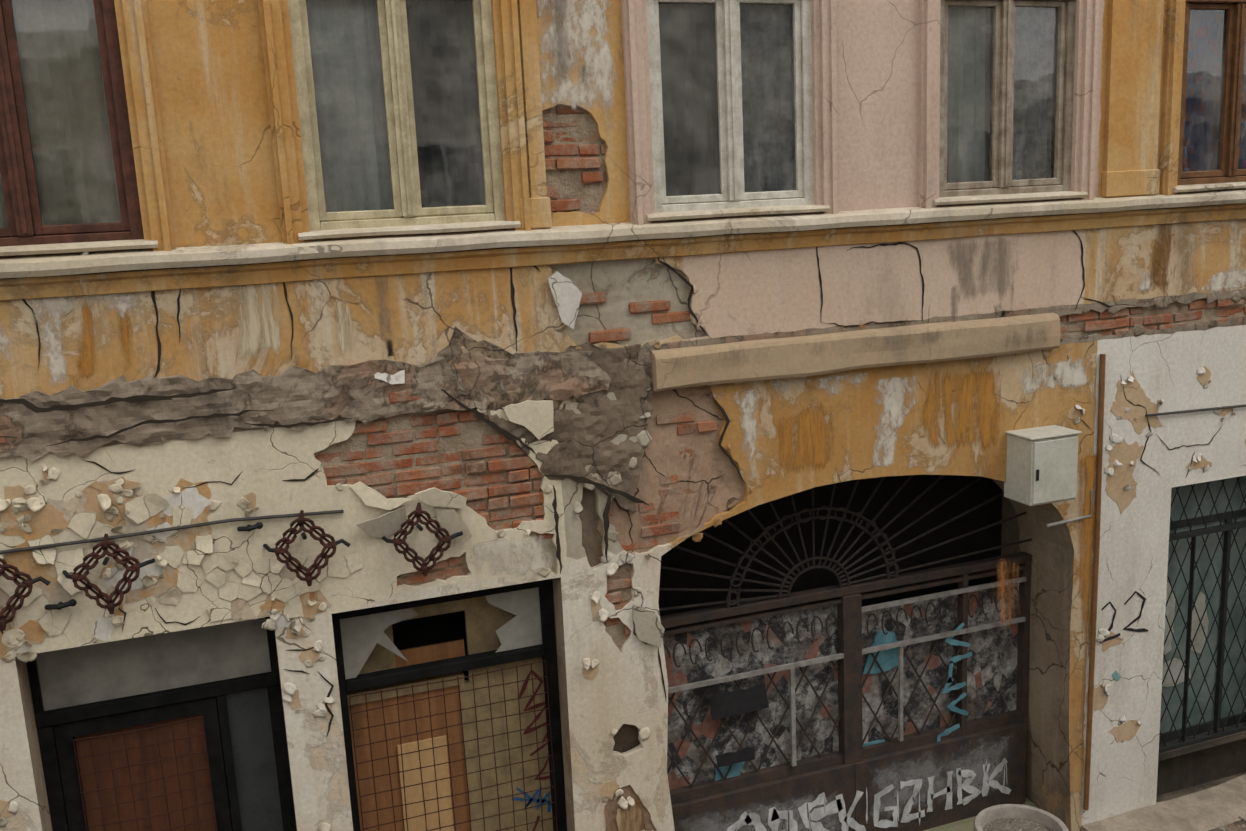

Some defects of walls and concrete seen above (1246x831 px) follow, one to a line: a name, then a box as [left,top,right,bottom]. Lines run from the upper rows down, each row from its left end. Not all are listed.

flaking render [542,104,607,217]
flaking render [549,252,706,349]
flaking render [1059,291,1246,343]
crack [0,282,356,474]
crack [185,472,242,488]
crack [282,468,319,481]
flaking render [313,402,557,578]
flaking render [573,384,753,651]
peeling [1104,370,1164,514]
flaking render [397,553,470,586]
crack [118,608,200,631]
flaking render [600,780,657,831]